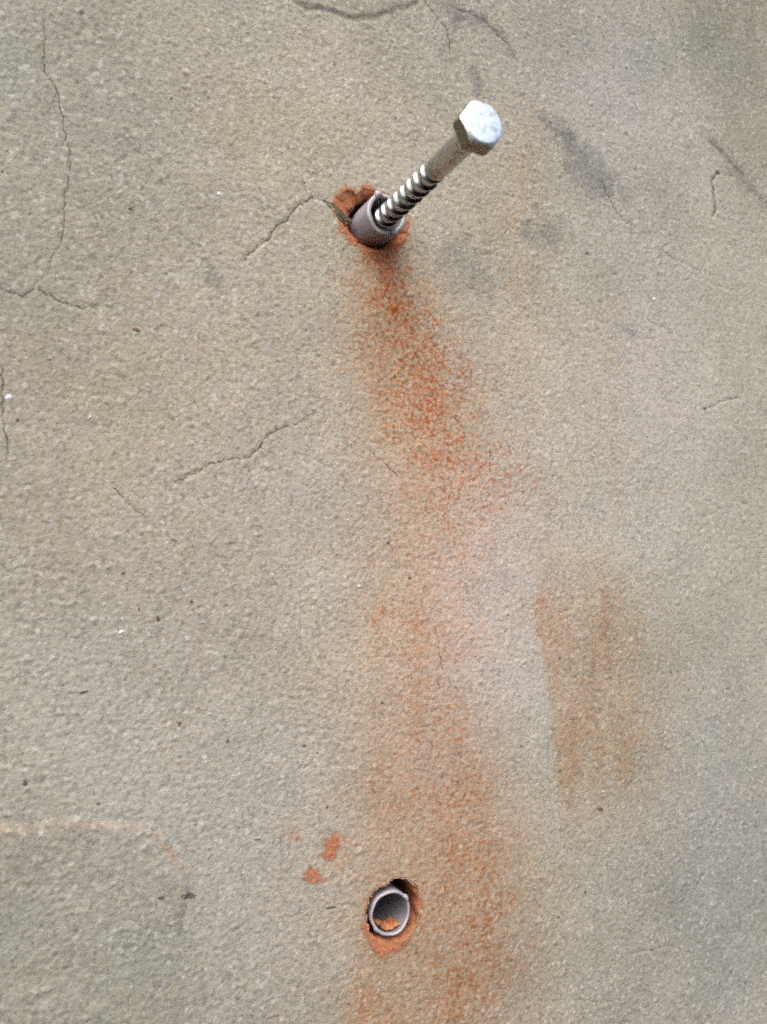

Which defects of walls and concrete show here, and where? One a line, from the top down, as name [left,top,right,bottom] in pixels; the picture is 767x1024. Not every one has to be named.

crack [425,1,511,53]
crack [0,28,91,309]
crack [245,177,323,260]
crack [170,419,308,487]
rust [302,834,344,883]
rust [362,903,411,959]